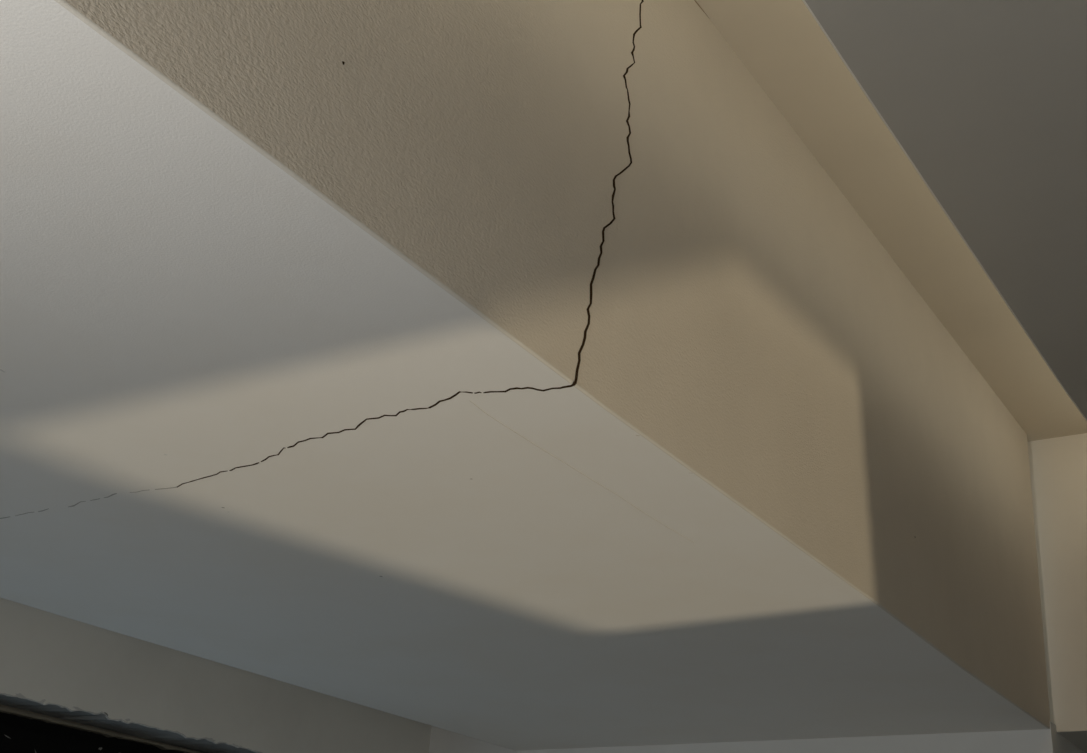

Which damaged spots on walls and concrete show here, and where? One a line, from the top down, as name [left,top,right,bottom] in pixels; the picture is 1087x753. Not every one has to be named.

crack [0,0,644,519]